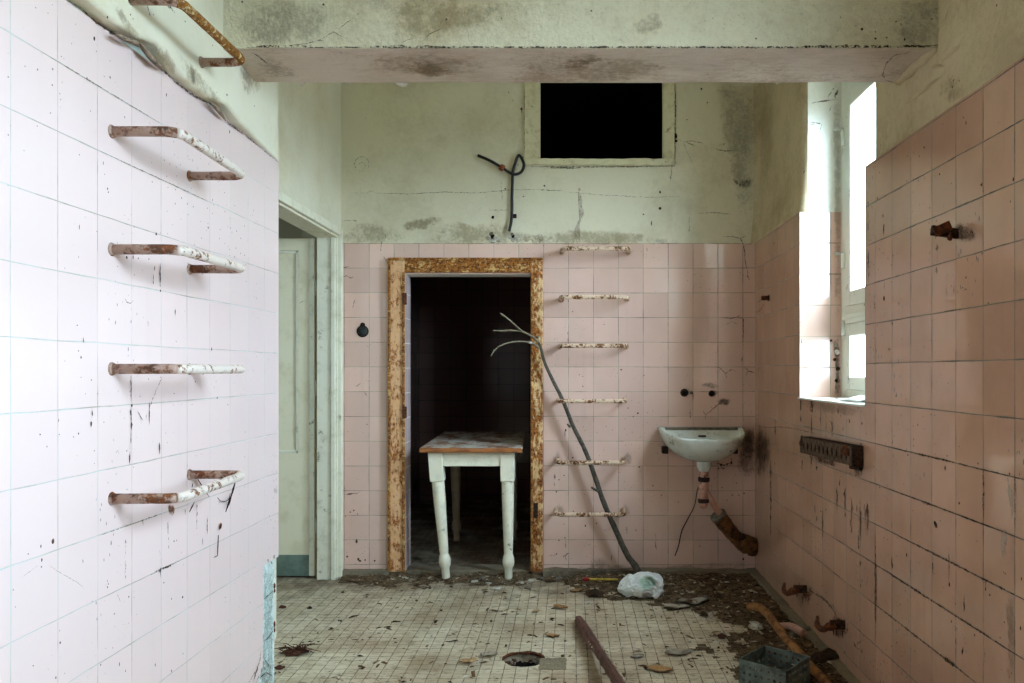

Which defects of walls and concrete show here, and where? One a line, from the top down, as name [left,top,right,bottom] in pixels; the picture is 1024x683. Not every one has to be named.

peeling [75,4,278,162]
damp [739,426,776,475]
spalling [259,562,276,680]